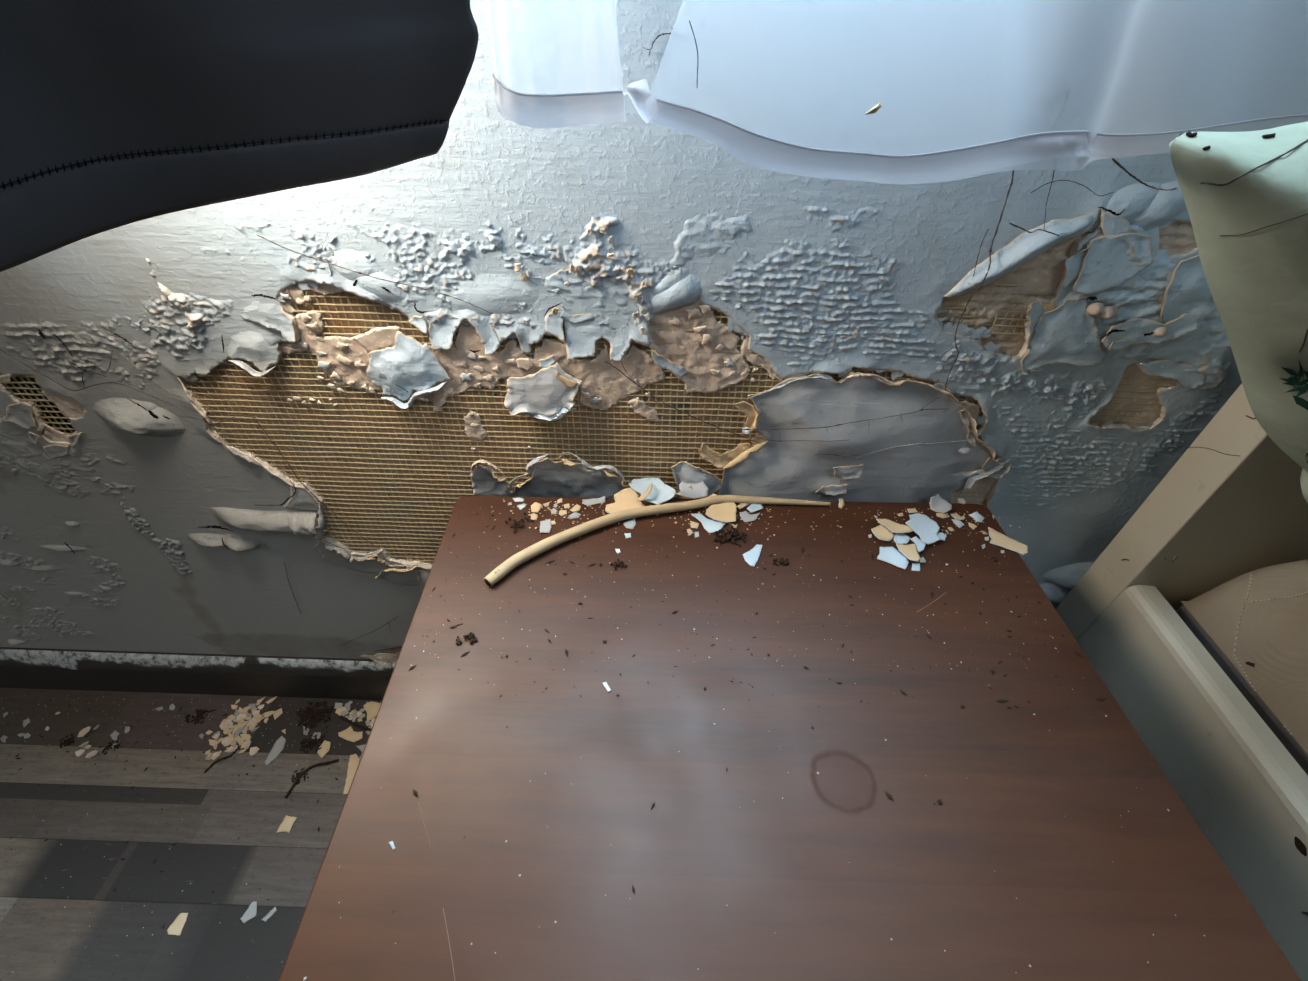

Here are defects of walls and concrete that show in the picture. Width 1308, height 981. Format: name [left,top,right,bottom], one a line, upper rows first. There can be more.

peeling [0,373,84,459]
crack [38,329,136,387]
peeling [179,260,1028,592]
peeling [937,181,1232,427]